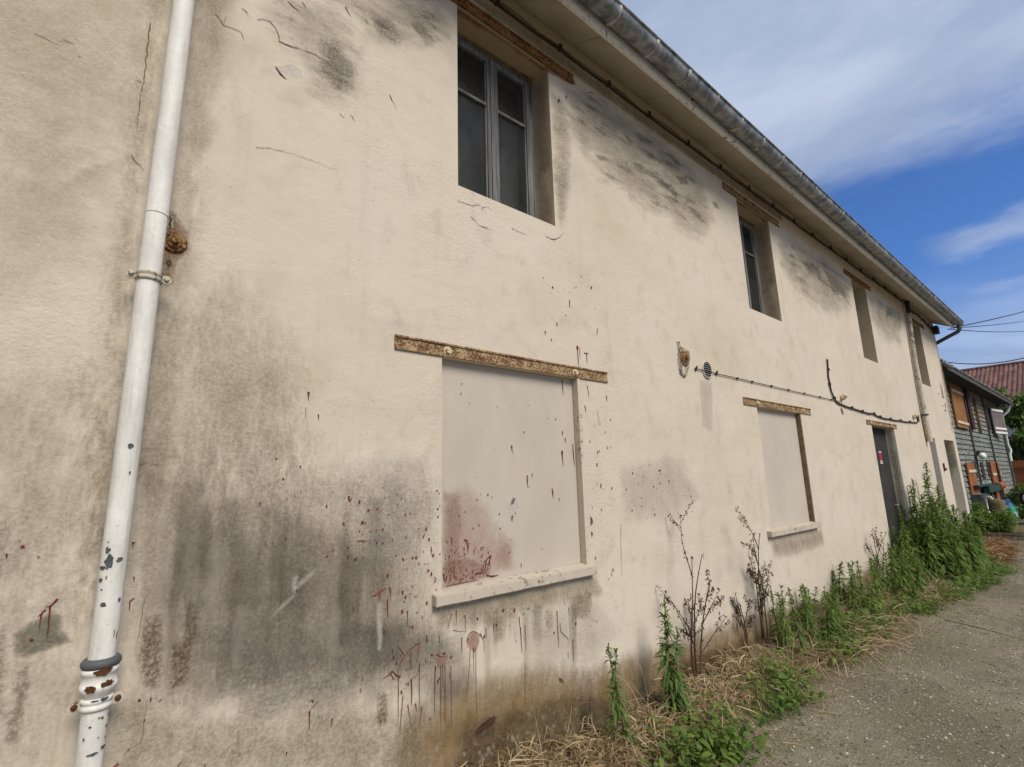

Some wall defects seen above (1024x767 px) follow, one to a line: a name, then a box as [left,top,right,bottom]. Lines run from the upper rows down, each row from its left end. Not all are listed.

crack [215,8,330,64]
crack [137,23,151,125]
spalling [99,542,123,607]
leakage [20,617,64,653]